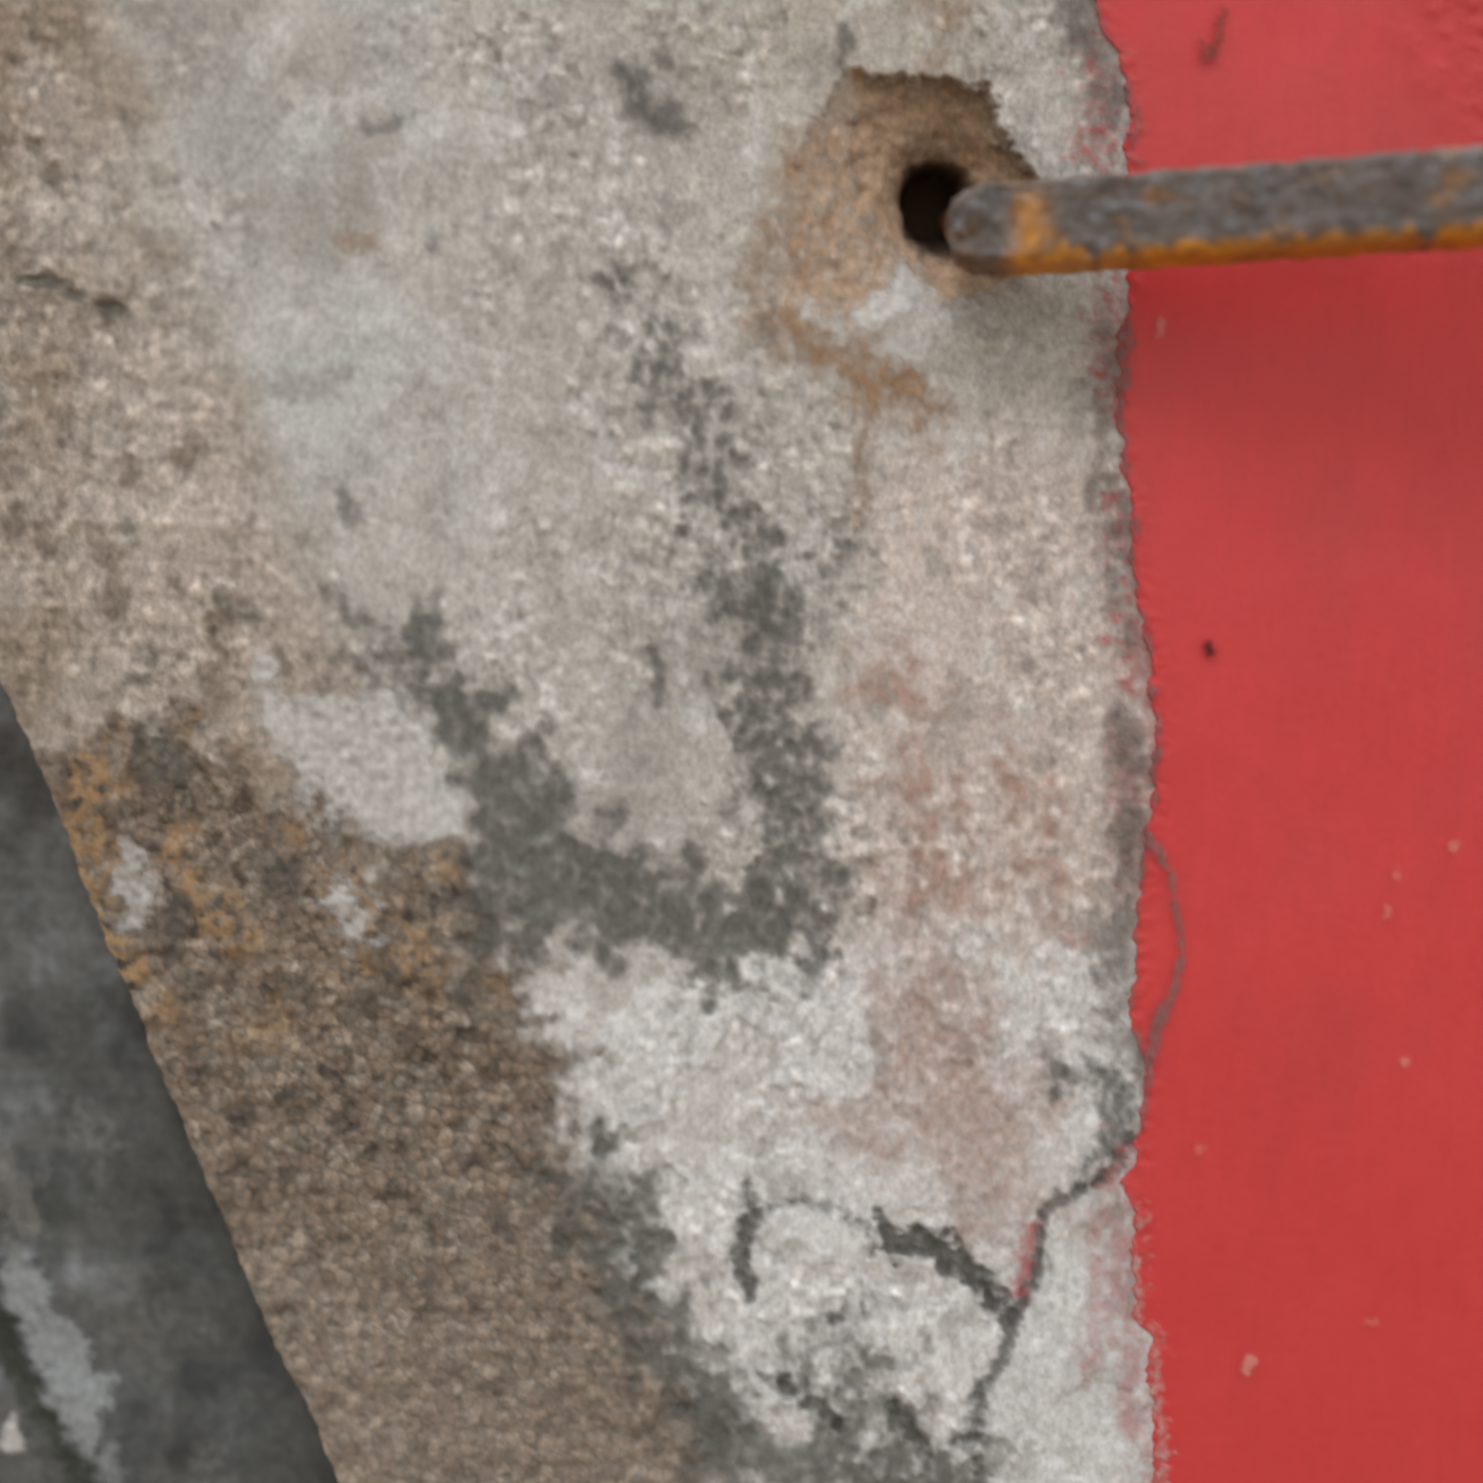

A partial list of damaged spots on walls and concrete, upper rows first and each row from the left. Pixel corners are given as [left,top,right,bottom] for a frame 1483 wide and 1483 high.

flaking render [781,68,1037,373]
corrosion [939,145,1483,280]
corrosion [793,327,932,424]
peeling [1090,276,1135,473]
leakage [249,321,850,1012]
peeling [1100,493,1161,802]
spalling [36,700,728,1483]
crack [732,1183,761,1299]
leakage [539,1120,989,1483]
crack [760,1374,841,1429]
crack [874,1132,1135,1480]
peeling [1131,830,1185,1124]